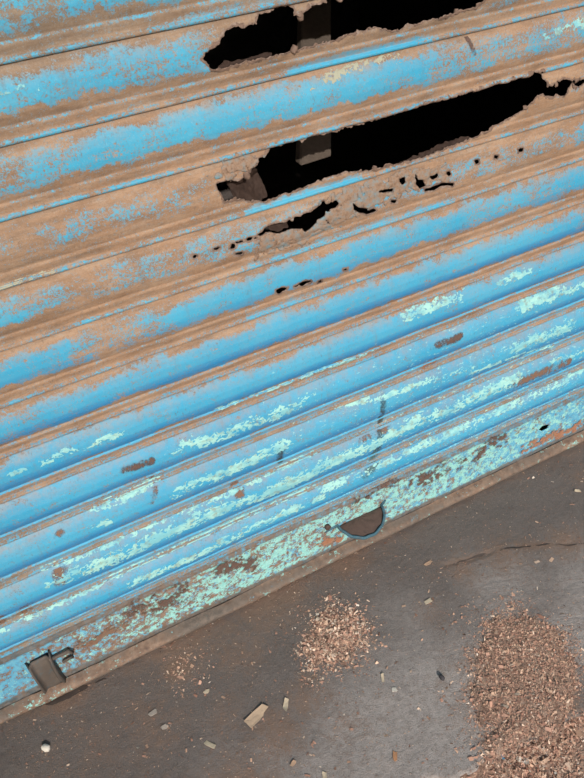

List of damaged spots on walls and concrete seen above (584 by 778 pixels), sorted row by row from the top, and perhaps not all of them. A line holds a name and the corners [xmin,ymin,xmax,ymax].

corrosion [207,149,266,181]
peeling [227,167,267,201]
peeling [267,222,288,232]
corrosion [254,160,449,261]
peeling [400,287,464,322]
peeling [514,282,584,316]
peeling [323,319,576,414]
corrosion [514,358,572,387]
peeling [0,368,584,633]
corrosion [213,556,259,578]
crack [454,543,584,564]
corrosion [67,582,189,657]